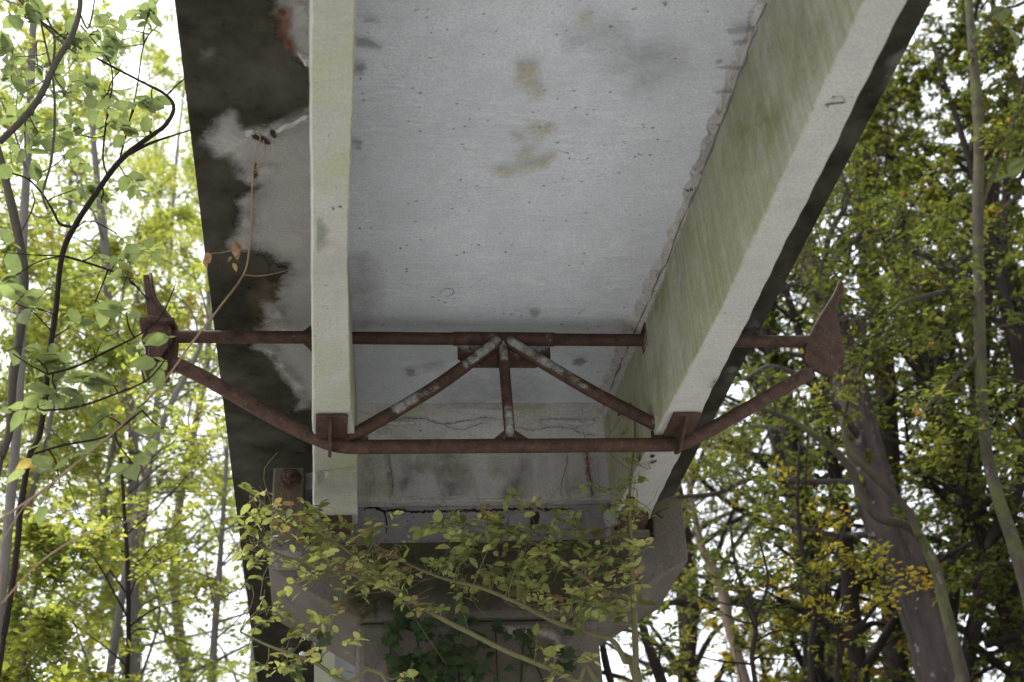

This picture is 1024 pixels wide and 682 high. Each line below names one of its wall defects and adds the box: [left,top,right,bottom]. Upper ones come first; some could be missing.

leakage [174,0,312,428]
leakage [223,397,314,682]
crack [364,417,593,532]